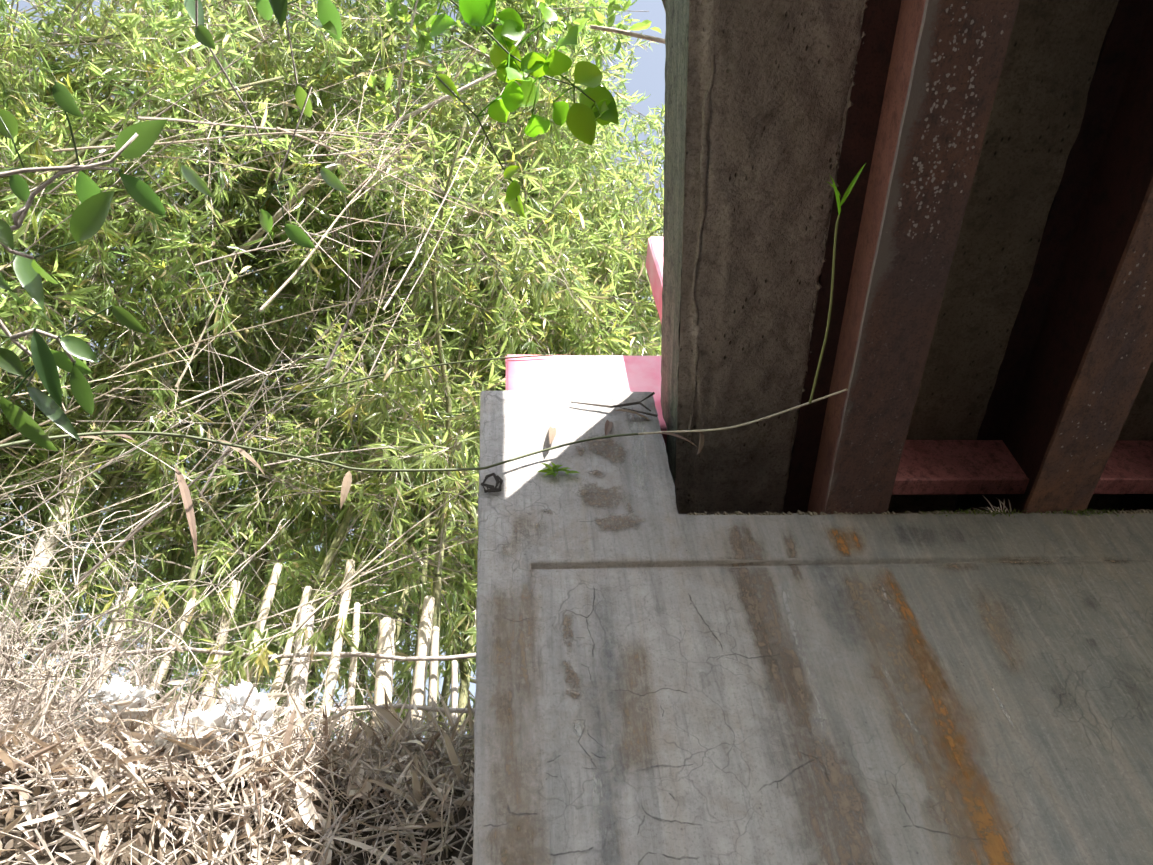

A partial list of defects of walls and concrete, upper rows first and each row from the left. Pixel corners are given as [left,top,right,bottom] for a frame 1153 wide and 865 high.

rust [888,578,1014,865]